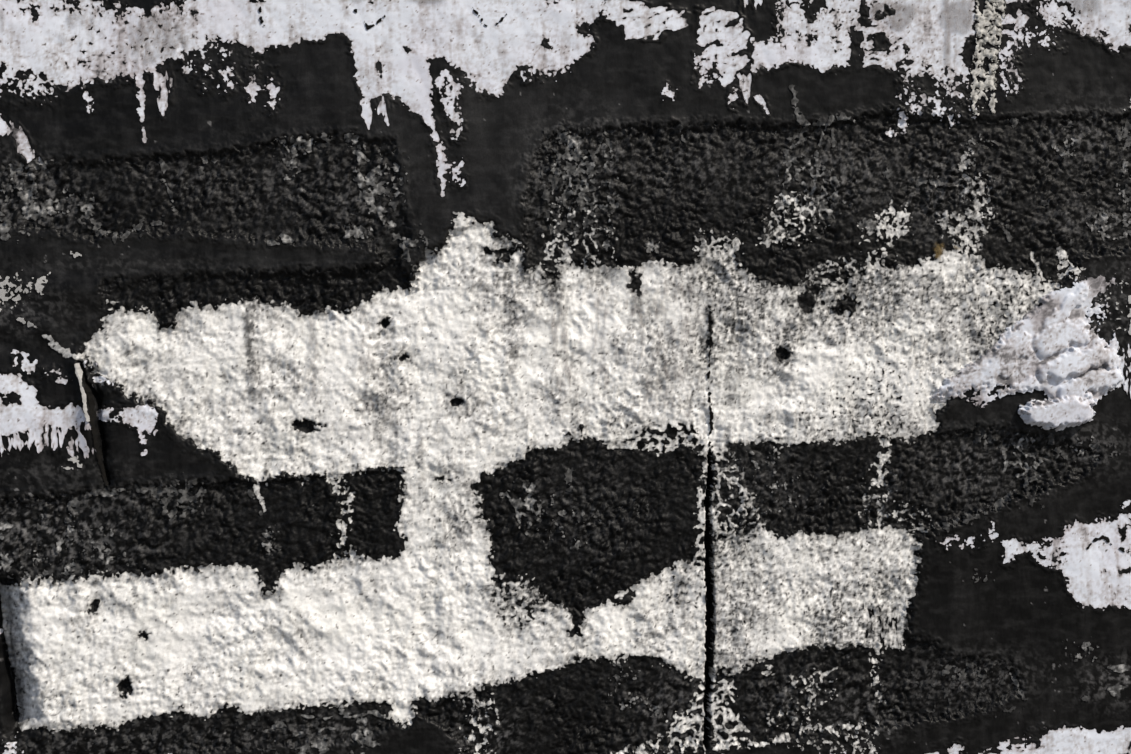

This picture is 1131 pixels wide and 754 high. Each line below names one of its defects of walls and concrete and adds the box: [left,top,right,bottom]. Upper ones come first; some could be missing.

peeling [0,0,688,197]
peeling [753,94,770,114]
peeling [693,0,977,105]
peeling [998,0,1131,97]
peeling [11,349,38,374]
peeling [0,363,91,468]
crack [703,305,714,748]
peeling [939,534,975,550]
peeling [1001,499,1131,611]
flaking render [803,738,837,754]
peeling [926,744,964,754]
peeling [978,725,1131,754]